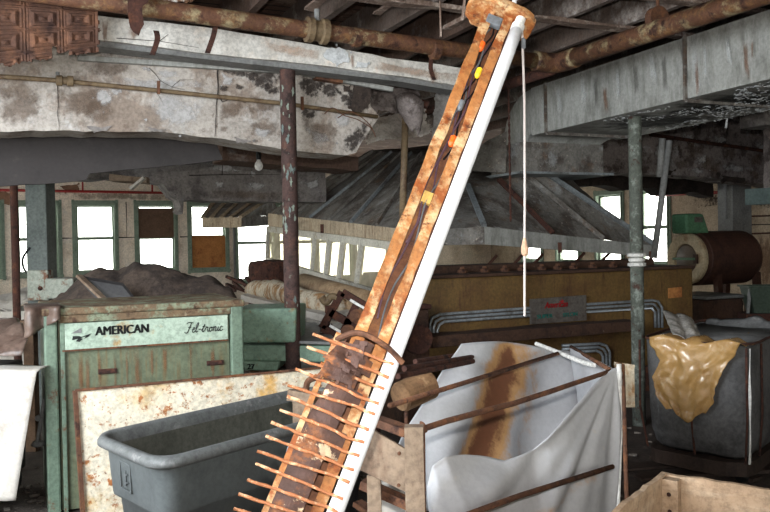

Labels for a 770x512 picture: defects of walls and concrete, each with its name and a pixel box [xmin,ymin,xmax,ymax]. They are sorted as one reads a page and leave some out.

leakage [299,76,354,106]
peeling [603,82,770,139]
leakage [345,122,371,151]